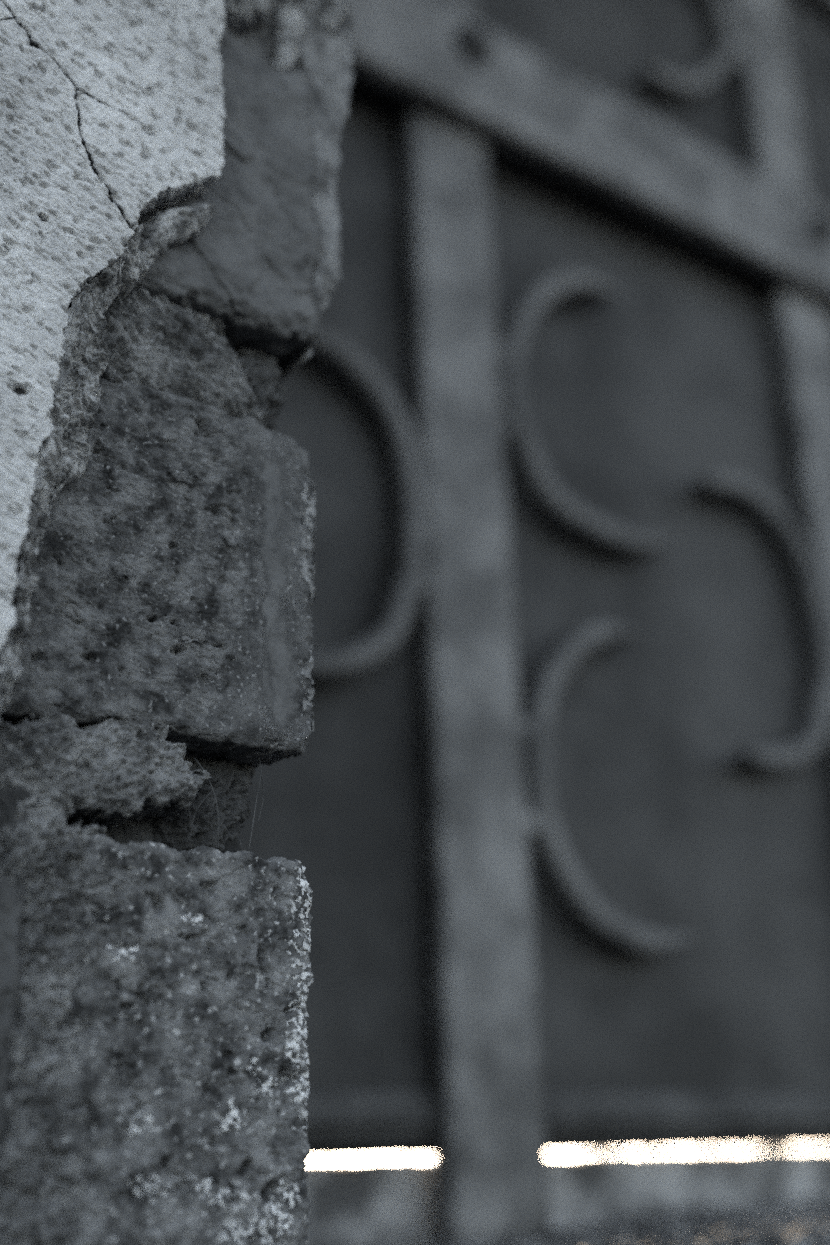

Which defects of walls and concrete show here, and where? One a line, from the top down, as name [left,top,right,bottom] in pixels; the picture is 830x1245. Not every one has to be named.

flaking render [223,0,349,73]
crack [0,0,156,229]
spalling [0,201,262,743]
spalling [299,479,317,604]
spalling [301,645,314,738]
spalling [96,823,132,845]
spalling [222,820,242,854]